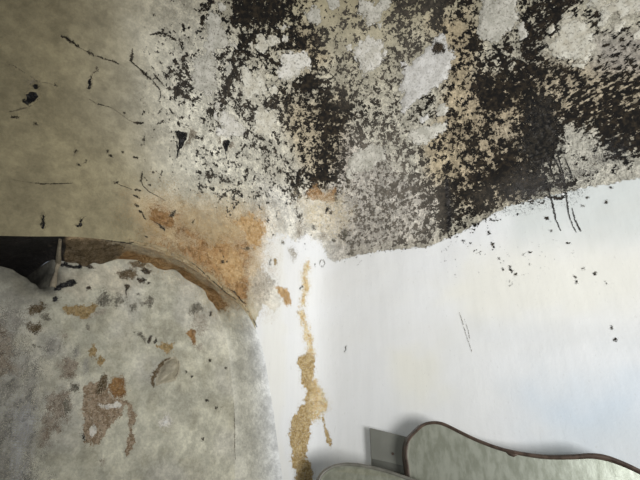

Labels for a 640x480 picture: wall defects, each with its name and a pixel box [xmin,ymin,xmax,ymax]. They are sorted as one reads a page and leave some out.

crack [61,35,165,100]
crack [150,31,183,51]
damp [63,0,640,331]
peeling [281,213,348,262]
spalling [51,279,108,320]
spalling [101,239,293,327]